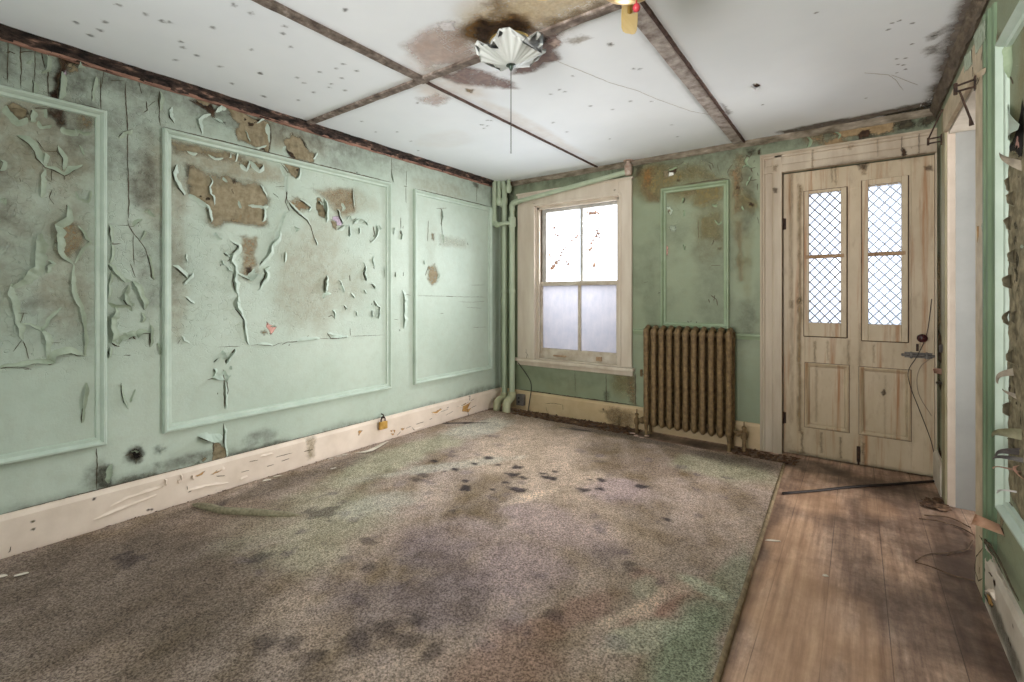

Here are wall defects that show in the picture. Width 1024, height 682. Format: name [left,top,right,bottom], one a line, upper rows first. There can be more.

spalling [2,58,92,136]
damp [409,0,601,93]
damp [781,0,972,148]
spalling [171,99,318,345]
peeling [291,189,403,243]
damp [637,168,729,236]
peeling [0,205,93,370]
peeling [108,264,162,357]
spalling [424,261,440,284]
spalling [991,136,1024,521]
damp [96,448,155,489]
peeling [94,424,290,520]